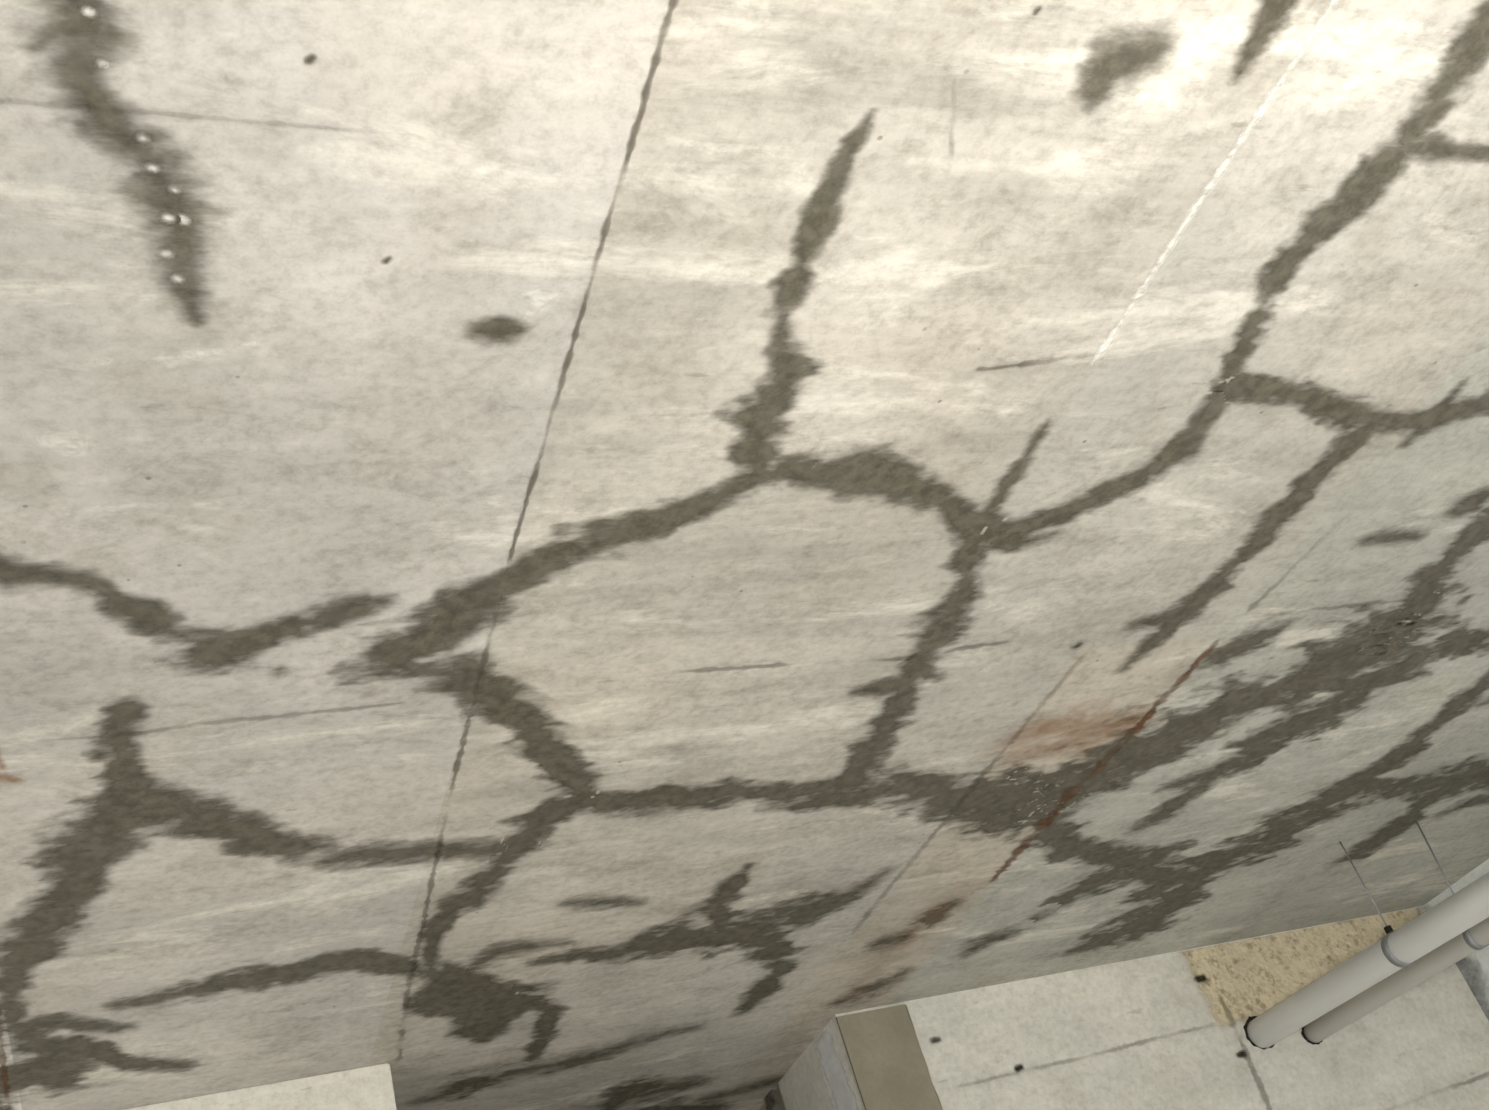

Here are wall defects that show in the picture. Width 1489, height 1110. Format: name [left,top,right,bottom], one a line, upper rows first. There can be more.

leakage [107,116,1489,1062]
leakage [1081,31,1171,105]
leakage [1123,0,1489,669]
leakage [423,1041,635,1101]